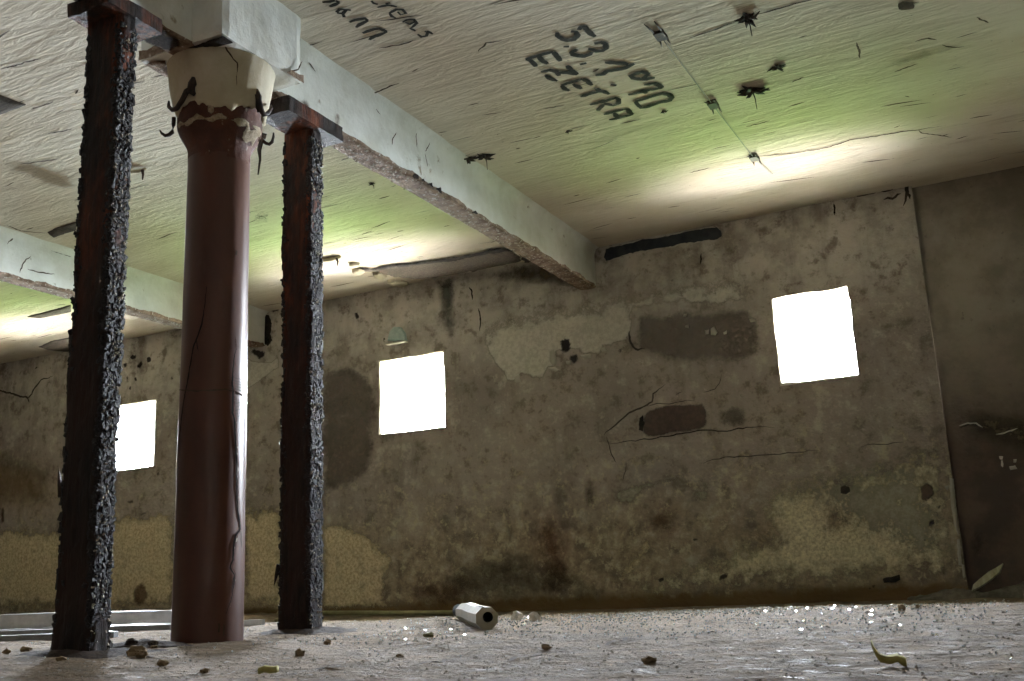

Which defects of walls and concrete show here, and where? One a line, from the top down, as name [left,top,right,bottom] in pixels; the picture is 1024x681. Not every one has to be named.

flaking render [178,105,261,146]
crack [738,126,948,159]
spalling [334,131,596,290]
flaking render [485,283,757,383]
crack [0,367,52,402]
crack [175,287,244,613]
crack [604,379,817,479]